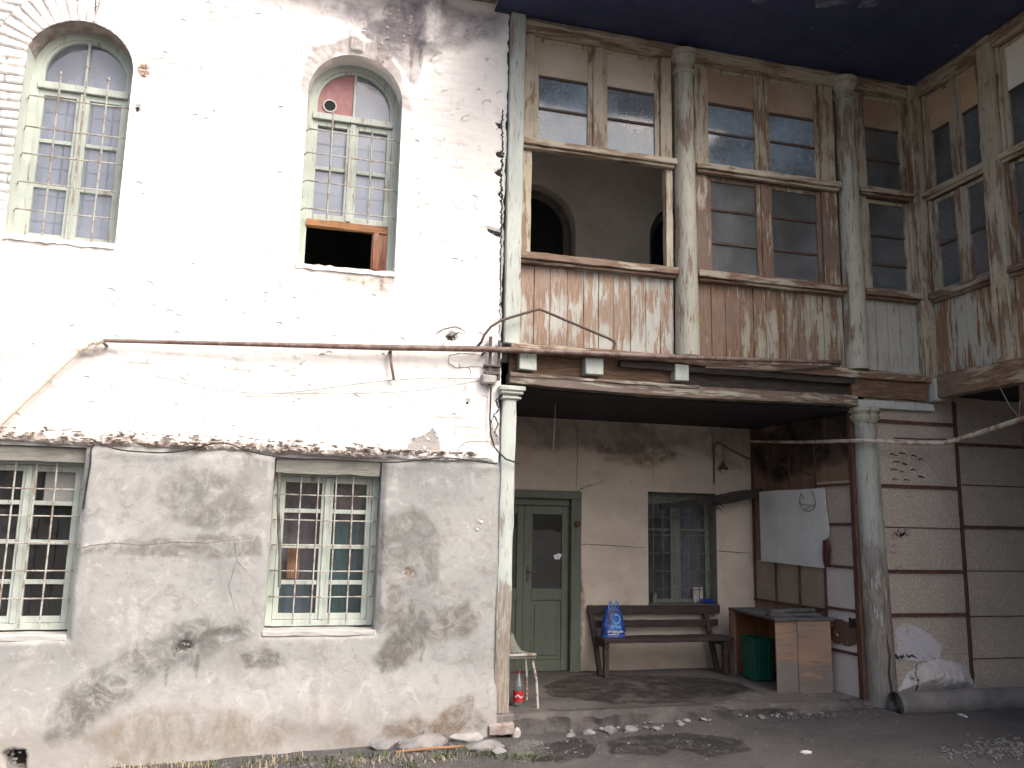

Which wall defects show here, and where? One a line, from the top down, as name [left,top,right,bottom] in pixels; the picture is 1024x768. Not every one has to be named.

peeling [0,426,480,456]
crack [77,536,253,608]
flaking render [894,624,978,692]
hole [7,747,27,767]